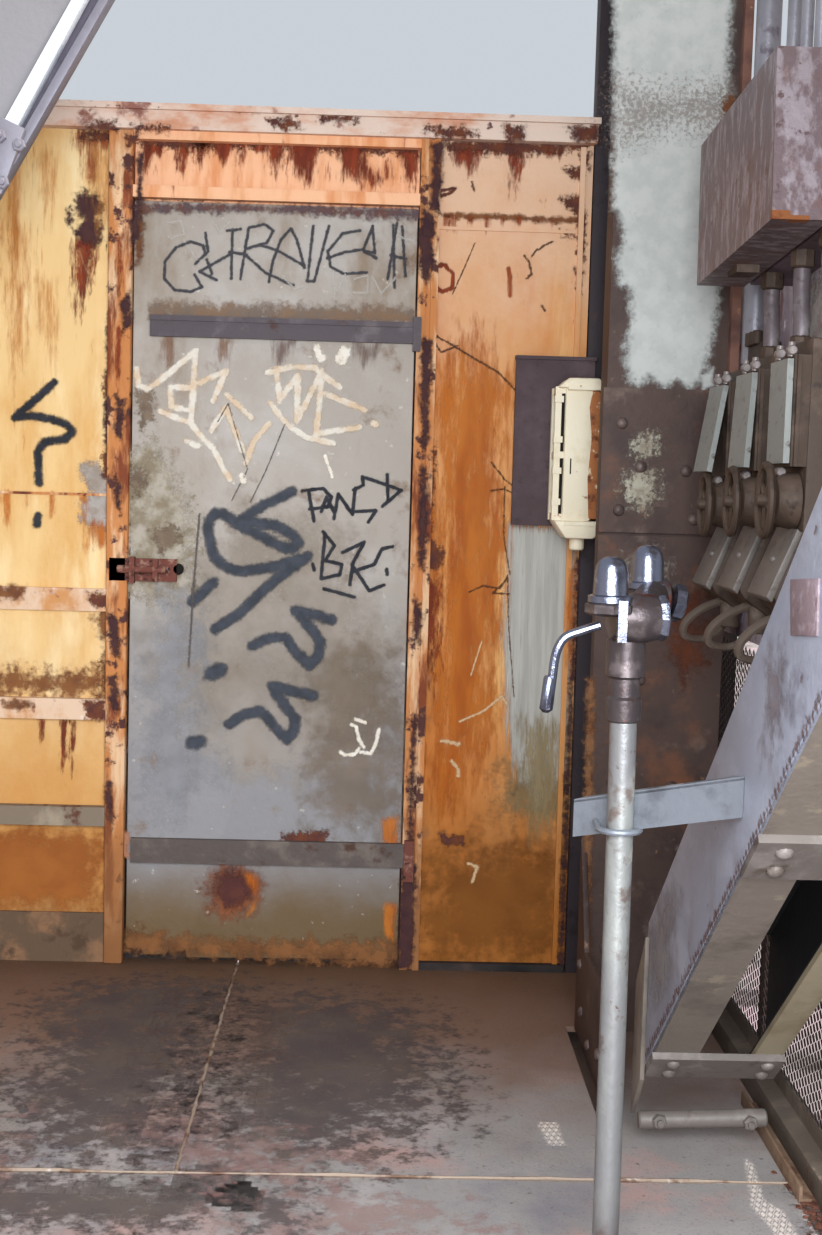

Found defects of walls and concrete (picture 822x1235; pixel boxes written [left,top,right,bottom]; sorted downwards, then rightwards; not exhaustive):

peeling [610,0,733,390]
corrosion [66,115,600,517]
peeling [615,429,664,515]
corrosion [0,584,25,601]
corrosion [0,590,120,770]
corrosion [383,337,520,843]
corrosion [104,781,113,814]
corrosion [124,864,417,968]
corrosion [280,829,329,841]
damp [0,973,491,1235]